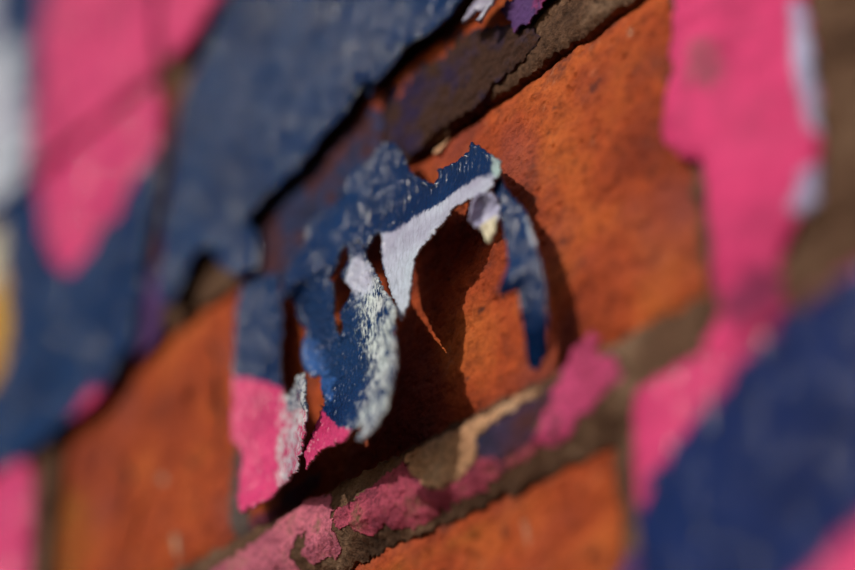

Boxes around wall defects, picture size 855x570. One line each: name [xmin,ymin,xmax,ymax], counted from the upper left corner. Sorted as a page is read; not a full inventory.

peeling [231,0,550,514]